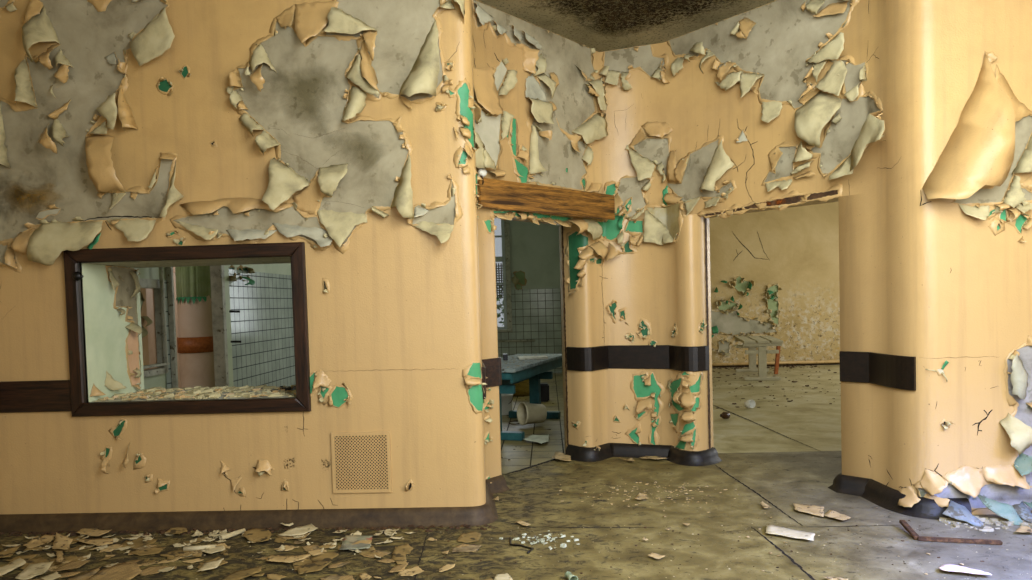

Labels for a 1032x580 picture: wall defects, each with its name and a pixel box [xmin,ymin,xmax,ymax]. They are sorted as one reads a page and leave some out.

mould [542,0,732,32]
damp [291,77,322,114]
peeling [0,0,885,296]
peeling [952,64,1032,242]
peeling [606,300,657,347]
peeling [698,276,782,357]
peeling [100,419,170,494]
peeling [310,370,353,408]
peeling [462,361,494,445]
peeling [613,371,704,461]
peeling [898,335,1032,513]
crack [972,386,997,435]